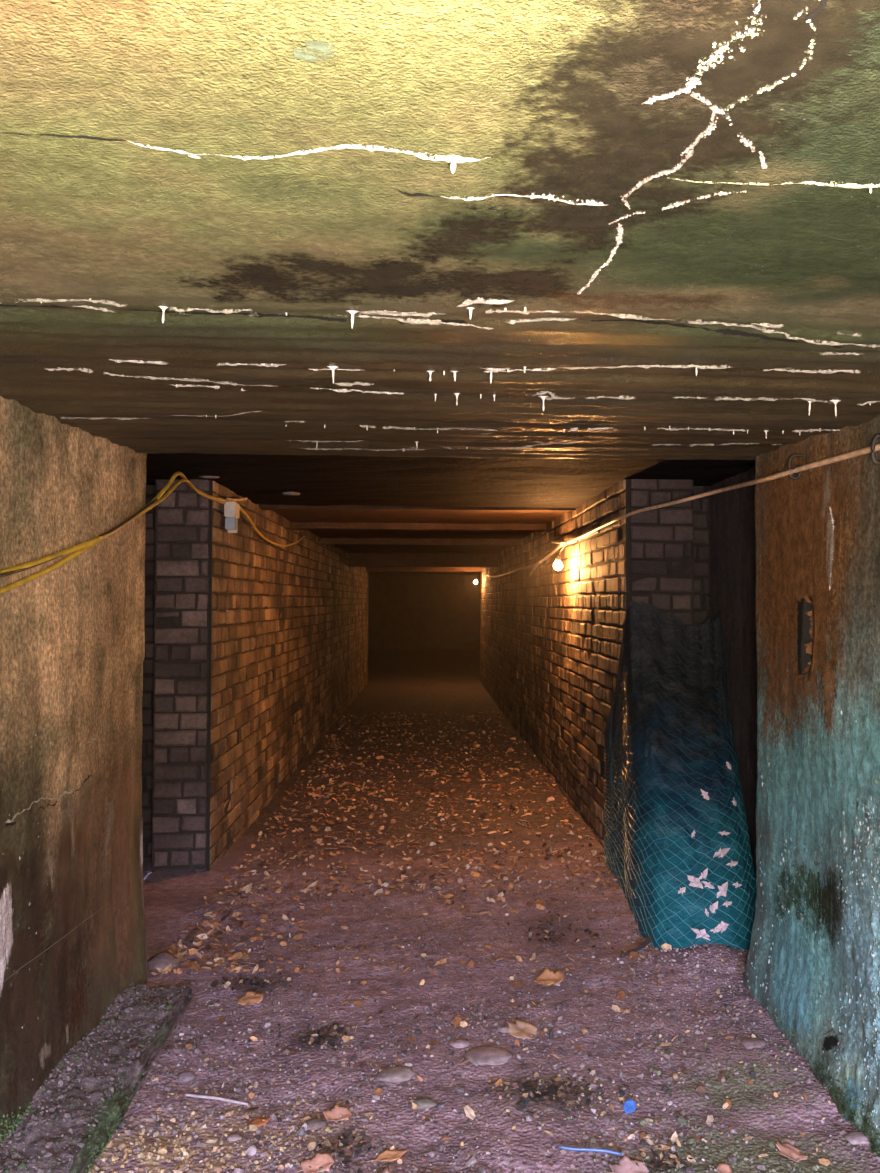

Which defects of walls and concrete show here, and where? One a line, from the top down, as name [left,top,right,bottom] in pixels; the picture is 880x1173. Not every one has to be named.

crack [0,0,880,451]
damp [180,0,880,307]
damp [0,883,42,996]
damp [749,698,880,1146]